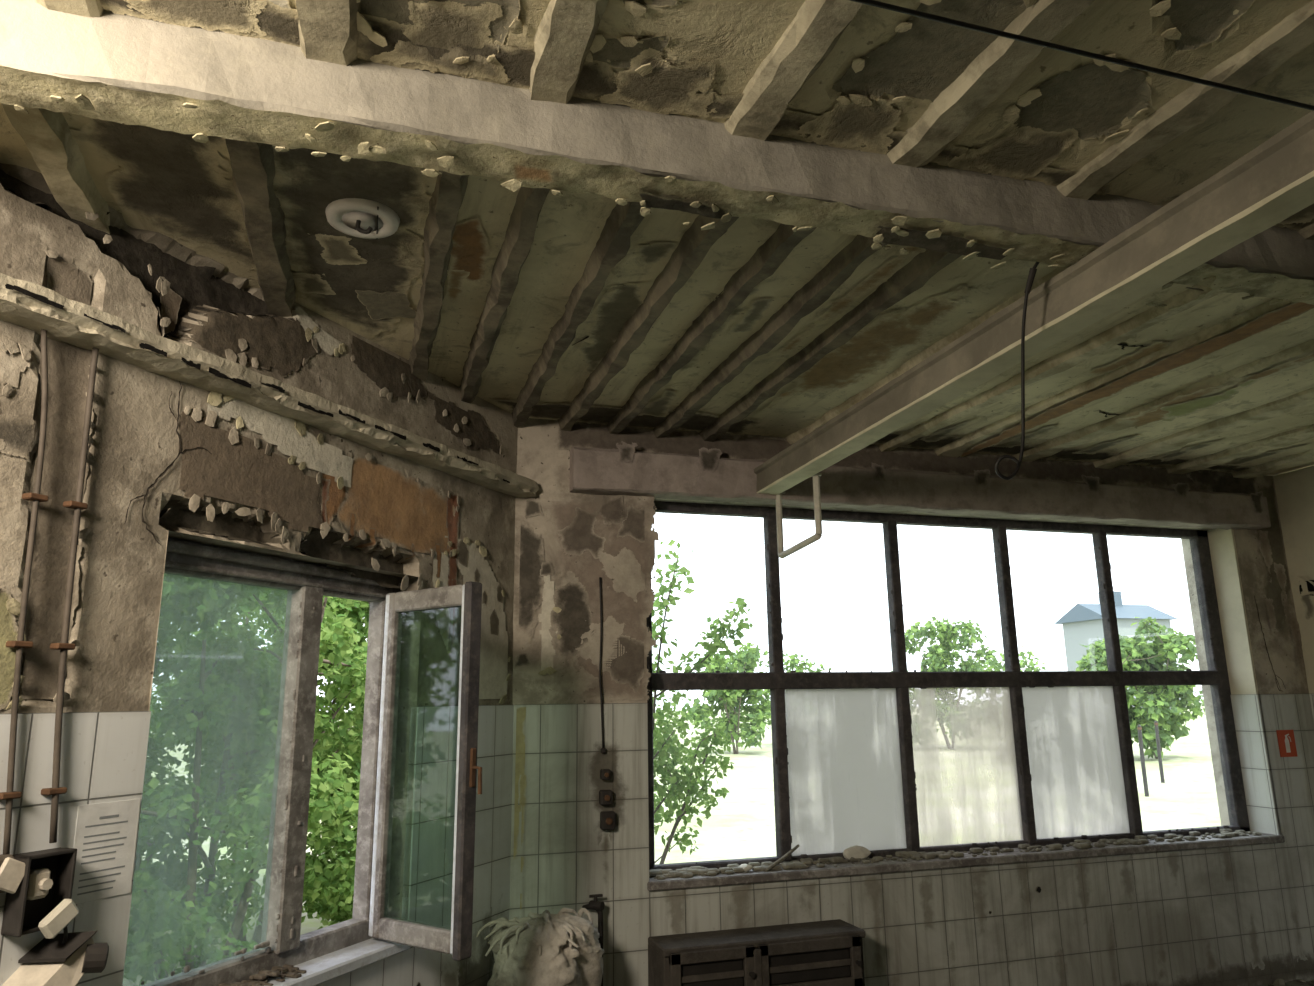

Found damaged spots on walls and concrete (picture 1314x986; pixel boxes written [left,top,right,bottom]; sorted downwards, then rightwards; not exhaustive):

peeling [357,0,523,63]
peeling [585,34,670,76]
peeling [832,0,1037,106]
peeling [1149,0,1255,52]
peeling [1003,53,1152,142]
peeling [305,121,386,162]
spalling [615,176,732,230]
spalling [871,216,1014,269]
peeling [556,495,645,602]
flaking render [538,571,579,676]
peeling [575,616,644,693]
leakage [661,888,689,935]